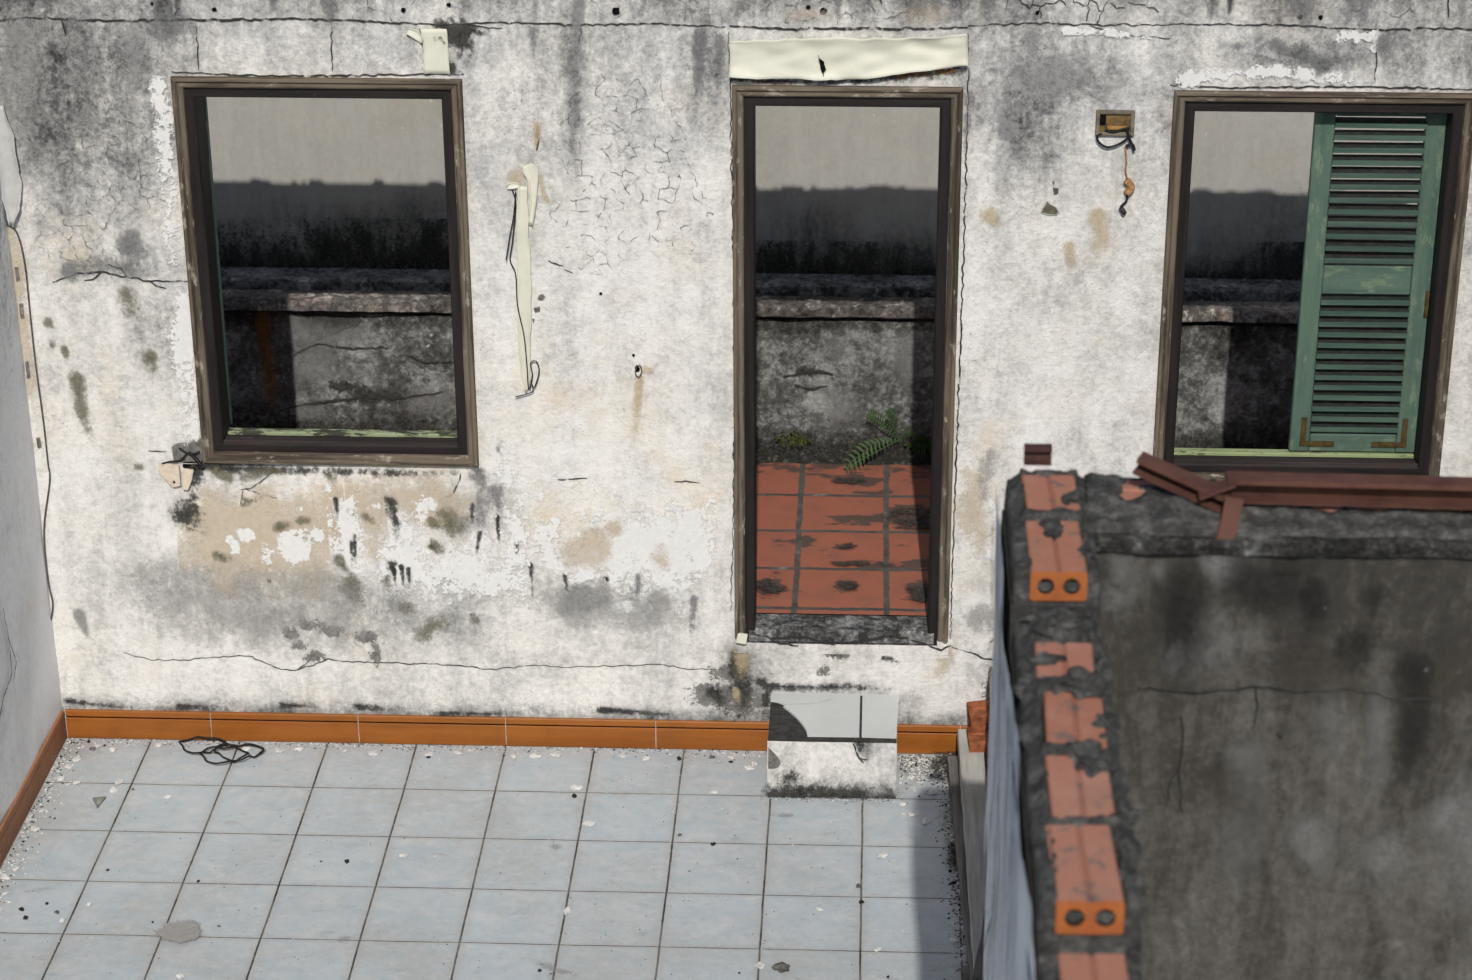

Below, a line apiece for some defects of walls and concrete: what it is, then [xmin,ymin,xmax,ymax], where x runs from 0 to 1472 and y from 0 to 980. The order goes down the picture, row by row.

leakage [126,0,191,112]
peeling [148,75,183,270]
peeling [506,163,545,393]
crack [0,0,1472,661]
peeling [158,290,717,615]
flaking render [282,618,382,668]
leakage [334,535,363,604]
leakage [171,460,534,582]
leakage [382,561,411,586]
crack [123,652,723,671]
leakage [415,618,446,641]